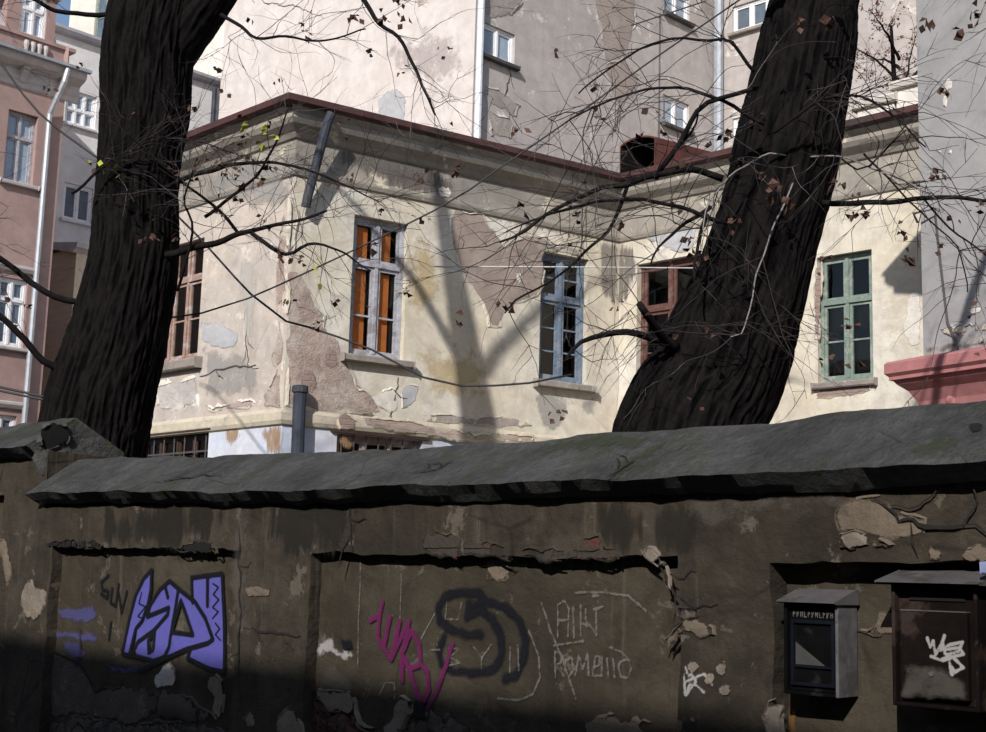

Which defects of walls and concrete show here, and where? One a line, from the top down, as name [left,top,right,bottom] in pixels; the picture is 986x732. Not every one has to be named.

spalling [485,0,523,18]
spalling [596,0,640,102]
spalling [482,86,520,139]
peeling [448,210,583,329]
spalling [155,195,534,443]
spalling [32,422,71,475]
peeling [834,494,927,551]
spalling [0,539,11,588]
spalling [20,579,46,620]
spalling [274,705,305,732]
peeling [314,688,430,732]
peeling [761,698,787,732]